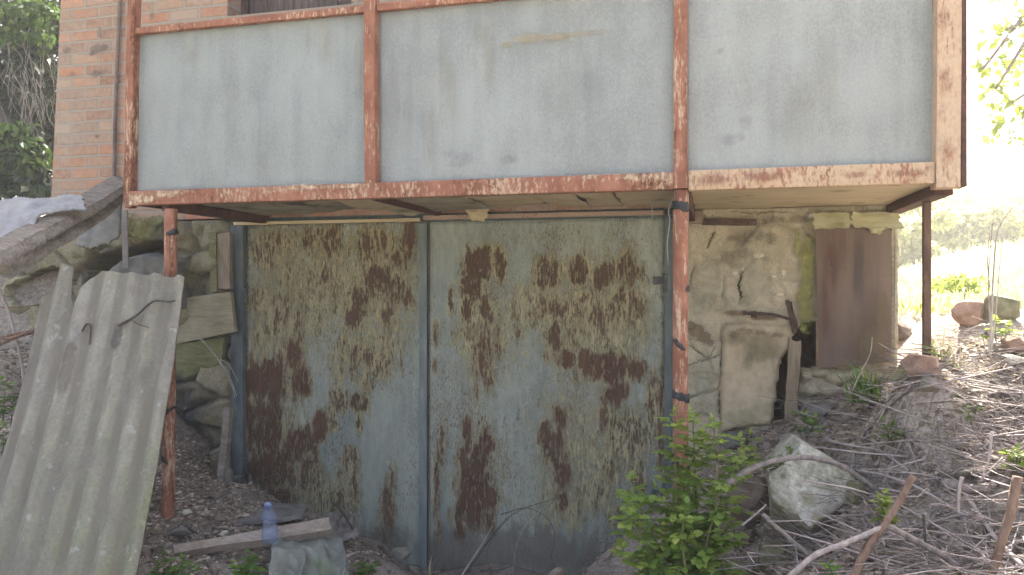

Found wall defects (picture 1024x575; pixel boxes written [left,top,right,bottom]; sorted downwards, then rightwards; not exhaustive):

corrosion [747,172,782,181]
corrosion [246,222,418,516]
corrosion [447,238,523,399]
corrosion [530,243,665,517]
crack [722,271,749,308]
corrosion [376,461,398,548]
corrosion [432,411,500,546]